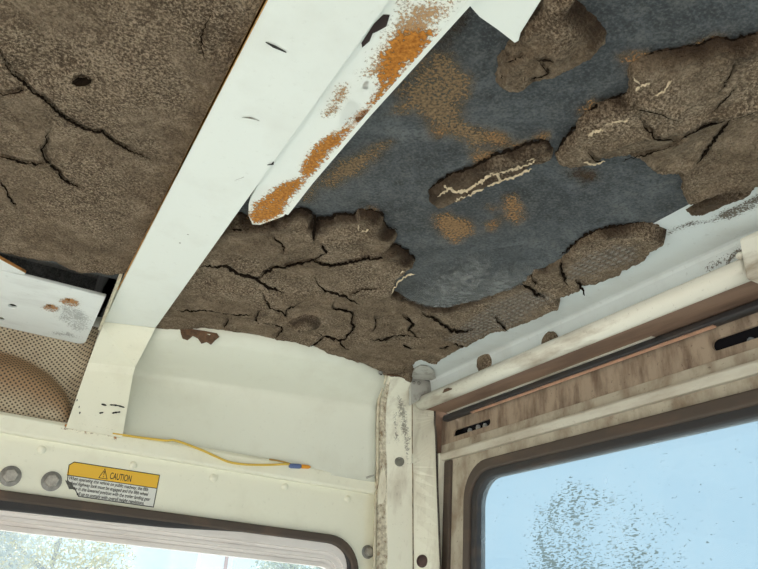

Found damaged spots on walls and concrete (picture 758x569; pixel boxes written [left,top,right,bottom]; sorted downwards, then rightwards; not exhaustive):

peeling [361,14,390,47]
crack [0,56,152,188]
corrosion [249,0,453,223]
crack [623,69,756,163]
peeling [437,159,535,202]
corrosion [43,298,79,312]
crack [177,220,395,350]
crack [373,314,472,349]